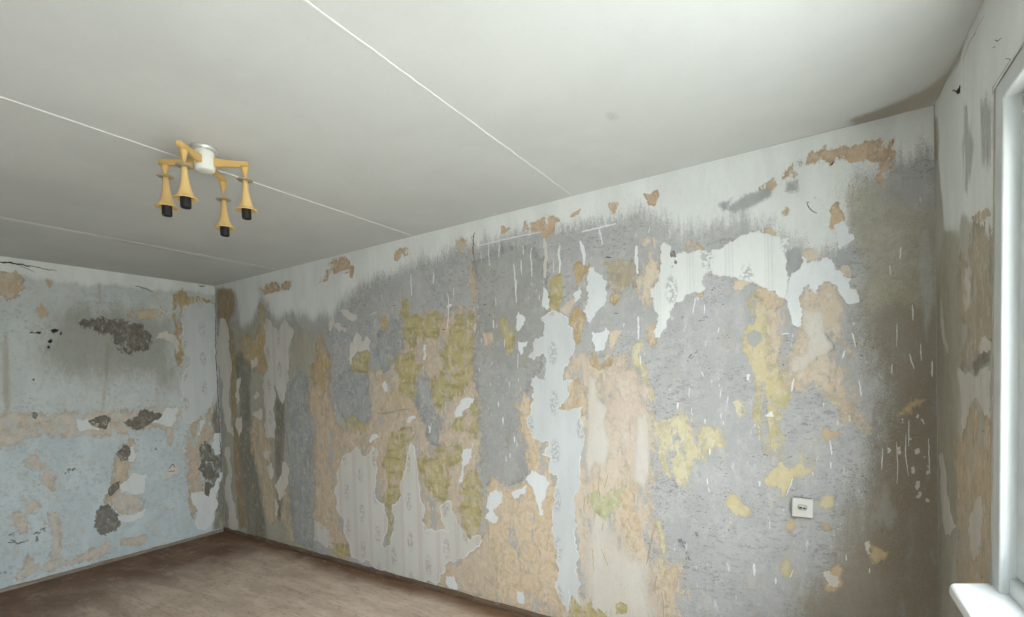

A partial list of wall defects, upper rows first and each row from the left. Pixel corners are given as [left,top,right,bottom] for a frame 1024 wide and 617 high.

leakage [11,286,188,400]
flaking render [0,402,223,583]
flaking render [78,288,215,368]
flaking render [235,389,296,546]
flaking render [306,238,500,597]
leakage [477,232,561,303]
leakage [579,223,616,266]
flaking render [553,328,700,617]
flaking render [778,264,873,445]
flaking render [758,136,896,191]
flaking render [952,401,991,584]
flaking render [957,207,993,375]